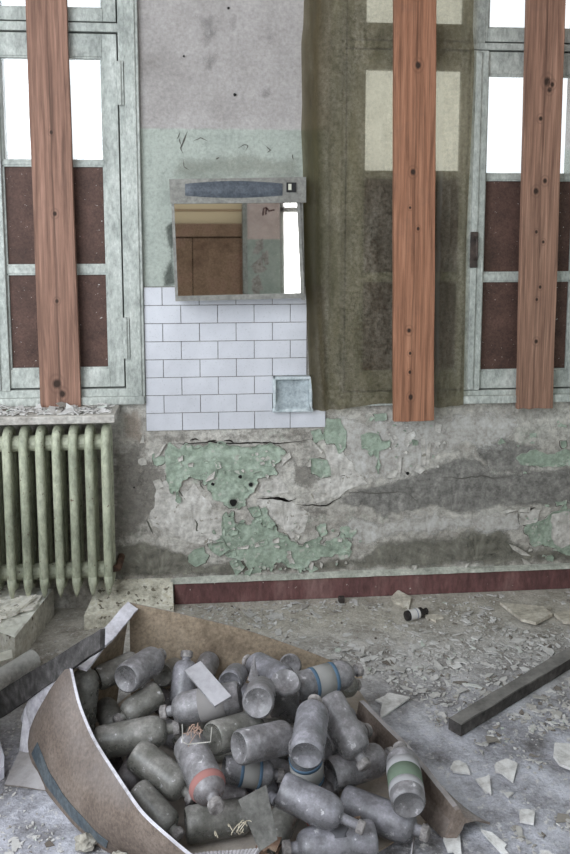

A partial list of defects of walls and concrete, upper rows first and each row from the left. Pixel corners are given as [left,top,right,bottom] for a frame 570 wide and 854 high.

peeling [138,441,362,576]
spalling [306,418,367,503]
crack [259,475,417,506]
peeling [361,413,418,474]
crack [441,473,511,481]
peeling [500,500,570,565]